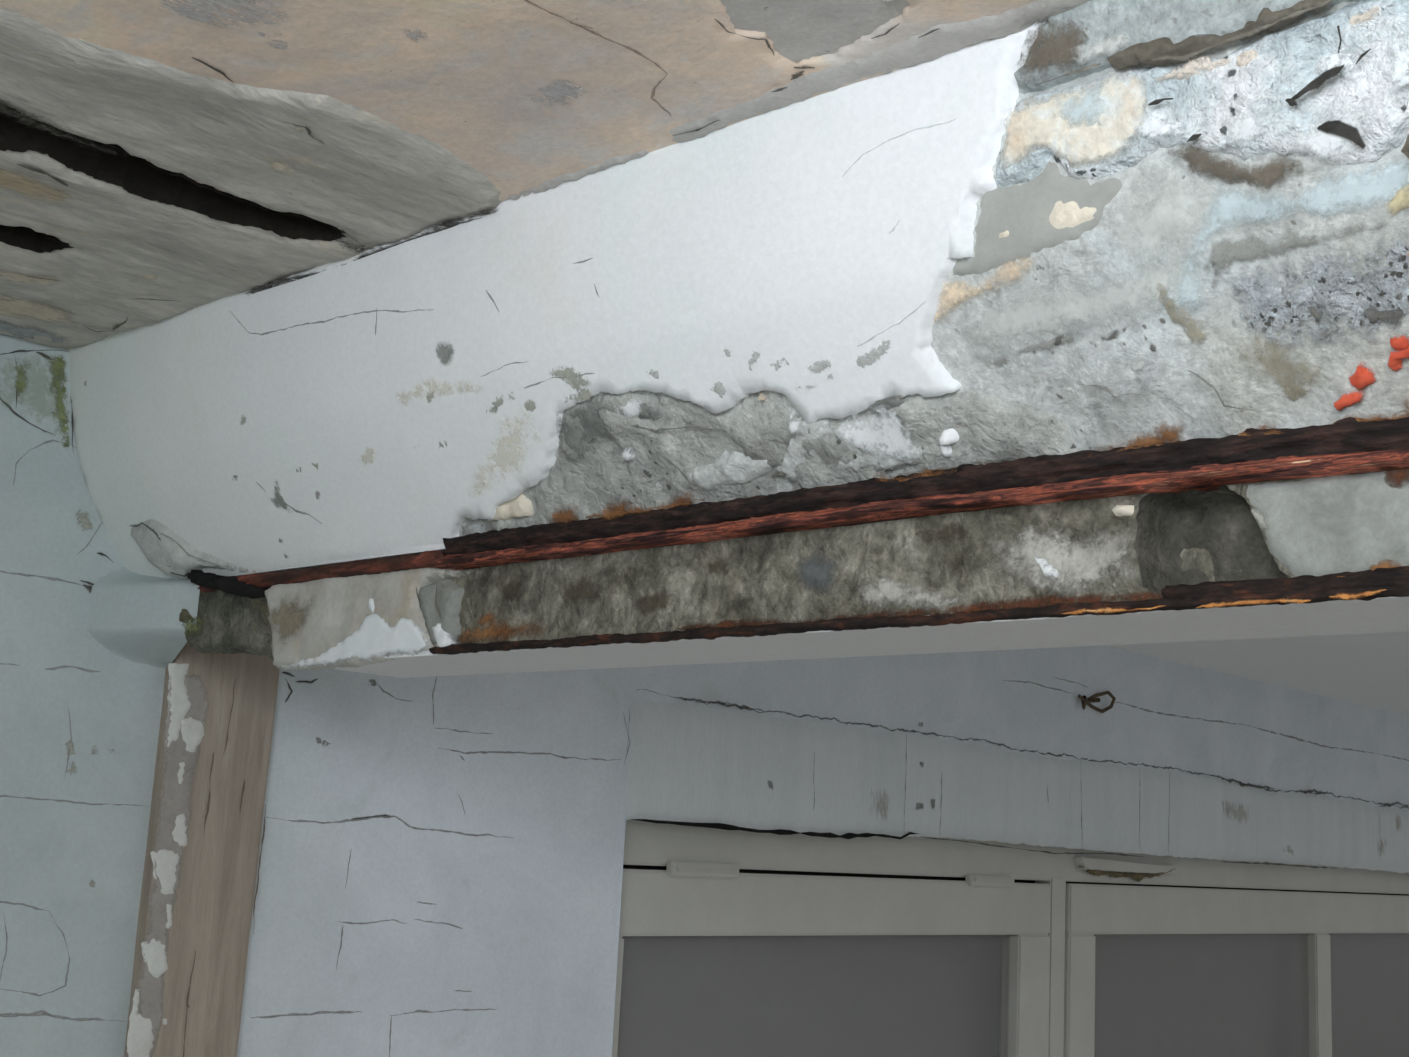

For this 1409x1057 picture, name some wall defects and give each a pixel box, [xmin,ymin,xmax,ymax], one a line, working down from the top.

spalling [459,0,1409,536]
corrosion [1087,425,1183,457]
spalling [1112,485,1291,599]
damp [636,592,667,612]
corrosion [682,593,1162,629]
corrosion [1196,599,1311,608]
corrosion [1329,589,1386,600]
flaking render [127,567,470,1057]
crack [267,796,511,888]
crack [379,676,1409,857]
crack [0,901,117,1021]
crack [251,990,496,1057]